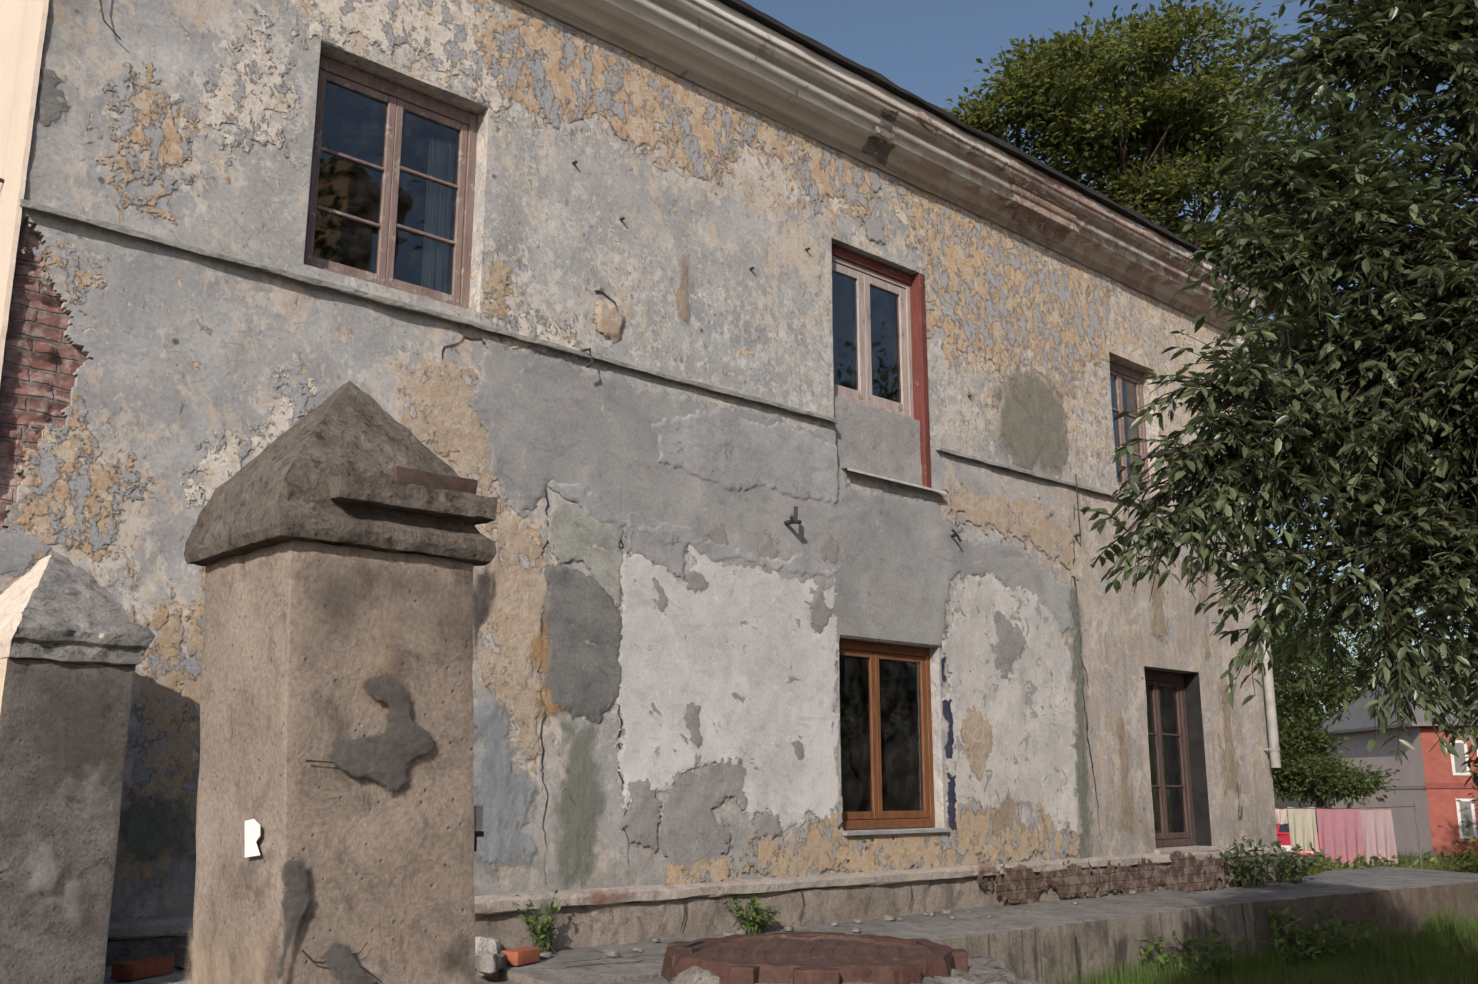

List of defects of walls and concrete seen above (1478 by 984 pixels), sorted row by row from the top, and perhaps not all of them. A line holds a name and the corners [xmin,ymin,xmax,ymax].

peeling [84,0,1119,408]
flaking render [0,218,319,588]
peeling [114,566,205,883]
crack [541,488,549,556]
crack [537,610,575,883]
peeling [620,702,1261,904]
flaking render [993,610,1026,679]